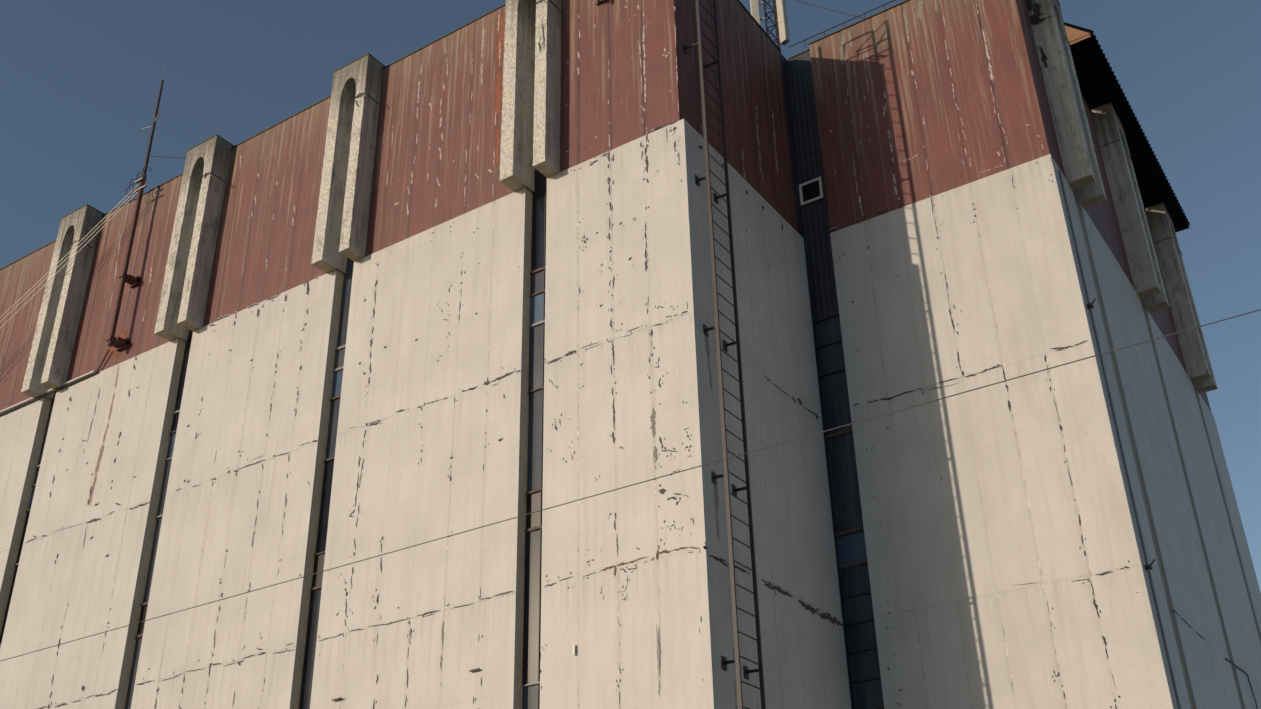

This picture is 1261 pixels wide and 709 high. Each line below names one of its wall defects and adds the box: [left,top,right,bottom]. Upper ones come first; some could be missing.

corrosion [494,13,505,164]
crack [852,197,1012,412]
crack [1,128,688,709]
peeling [650,407,695,545]
crack [764,375,820,419]
crack [544,513,843,626]